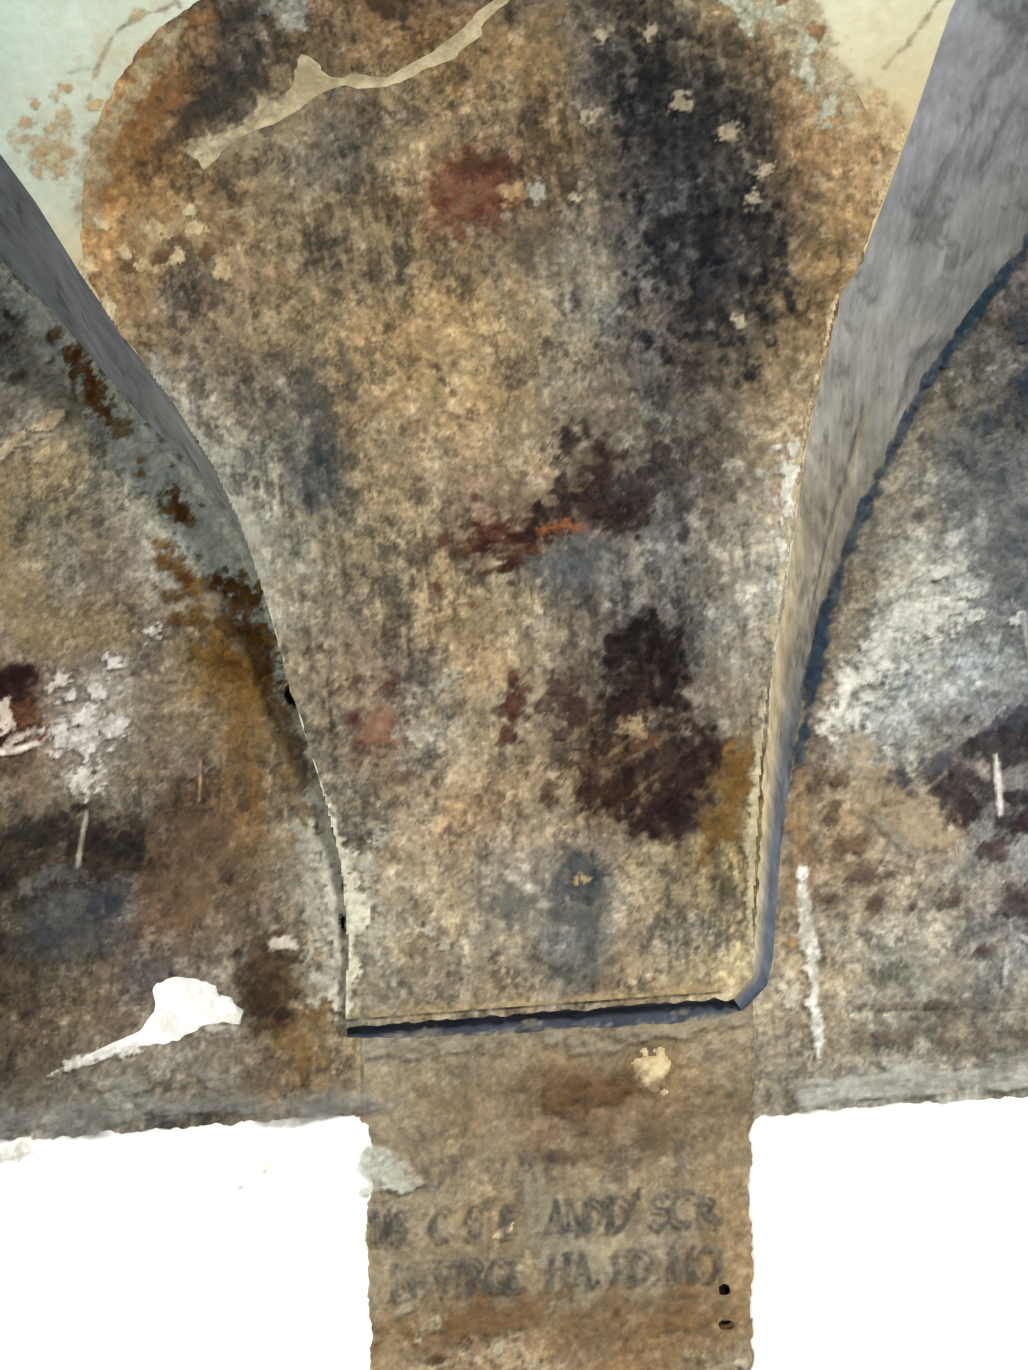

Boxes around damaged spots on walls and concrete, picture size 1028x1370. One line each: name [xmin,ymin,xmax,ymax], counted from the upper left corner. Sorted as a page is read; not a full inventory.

flaking render [187,0,509,169]
leakage [580,0,811,382]
leakage [0,652,234,961]
corrosion [135,457,286,813]
leakage [491,607,757,864]
leakage [872,701,1028,861]
flaking render [51,977,243,1075]